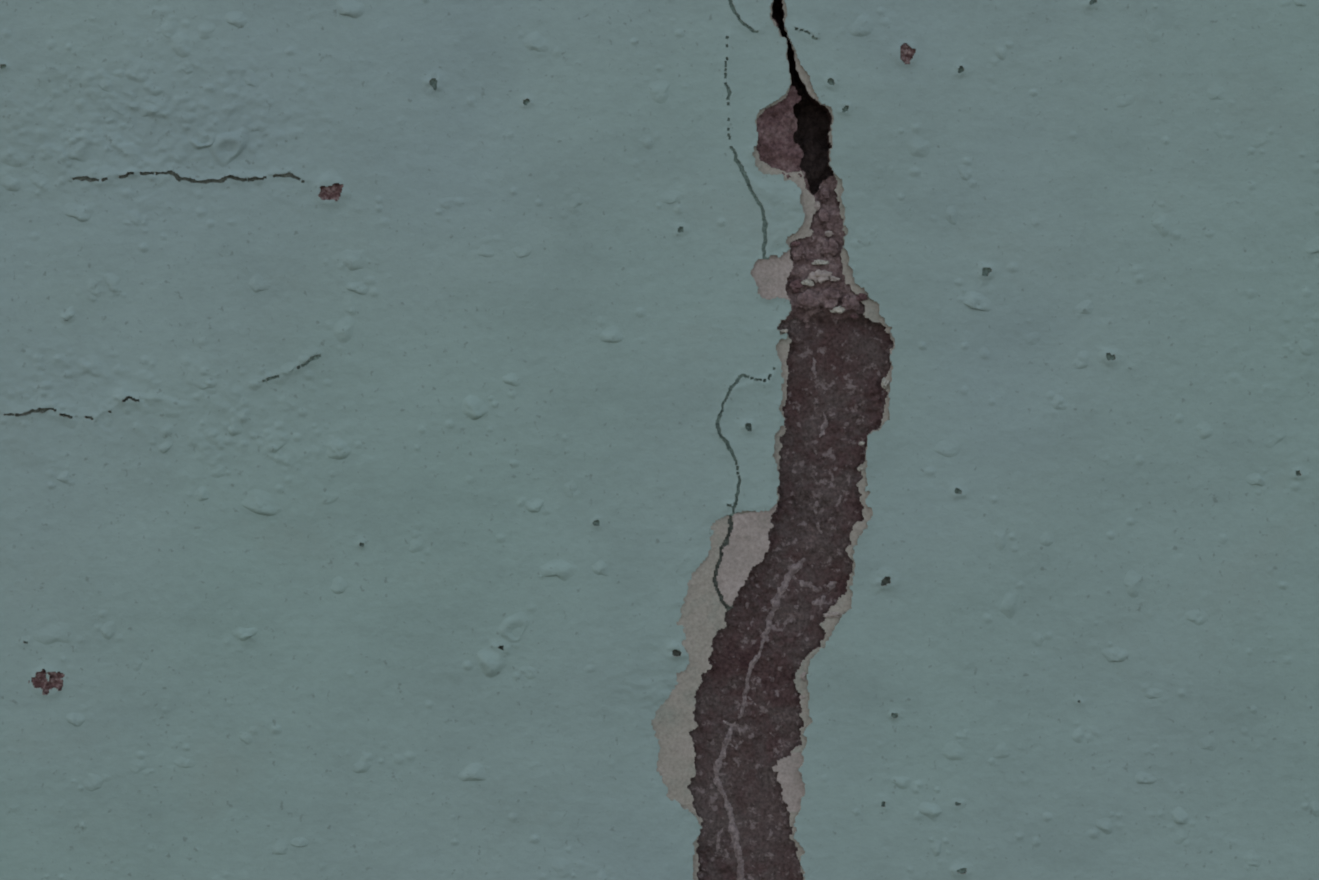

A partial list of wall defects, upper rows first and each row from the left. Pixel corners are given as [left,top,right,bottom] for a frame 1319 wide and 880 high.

crack [73,170,305,184]
corrosion [319,183,343,201]
peeling [750,251,794,301]
crack [4,396,139,420]
crack [681,0,895,880]
peeling [651,504,777,805]
corrosion [28,669,65,695]
peeling [772,752,805,812]